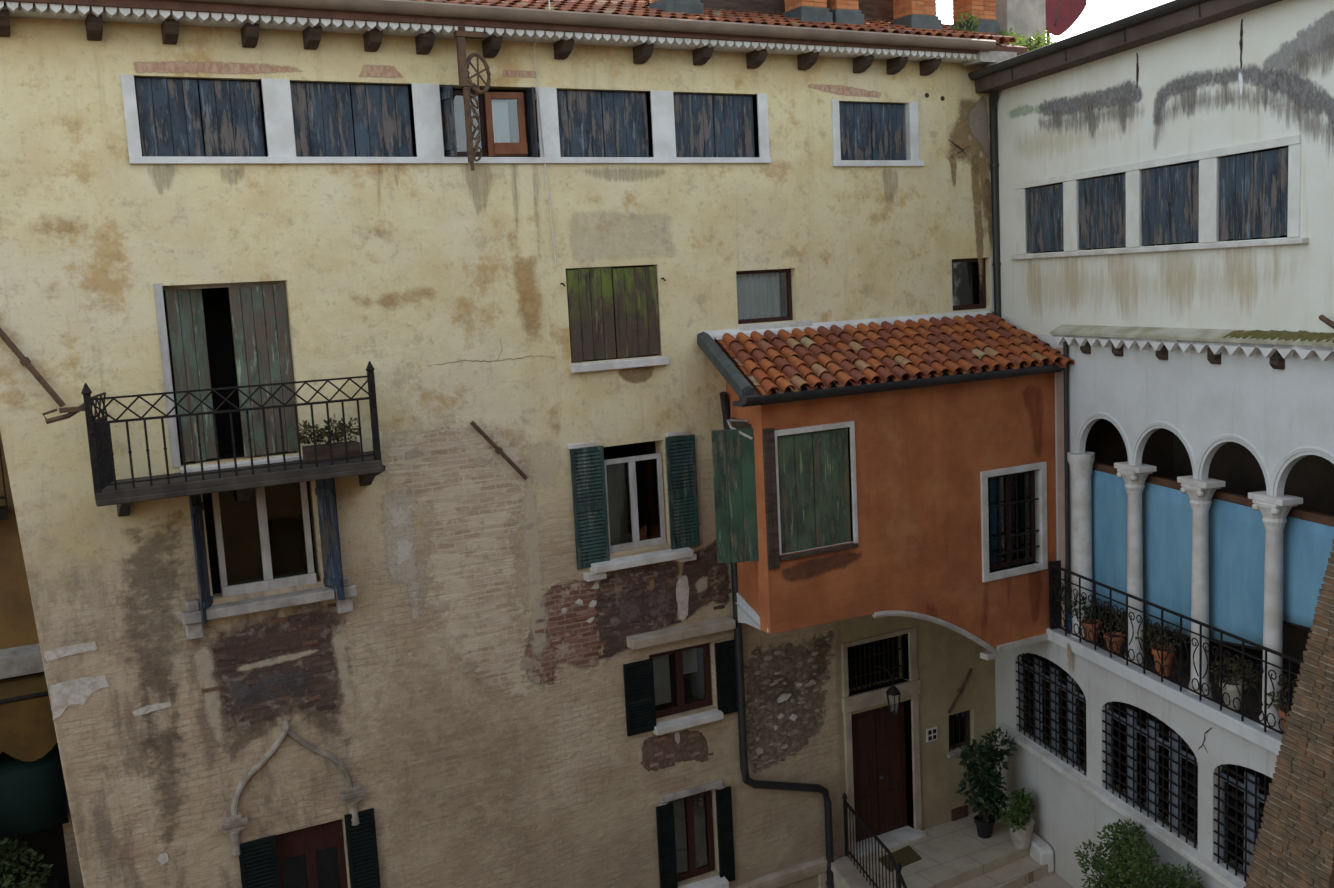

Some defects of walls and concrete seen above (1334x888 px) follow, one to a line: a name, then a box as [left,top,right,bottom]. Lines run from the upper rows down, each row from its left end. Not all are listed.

leakage [1011,11,1334,147]
leakage [950,101,992,283]
flaking render [380,421,732,701]
spalling [201,603,351,733]
spalling [634,724,715,779]